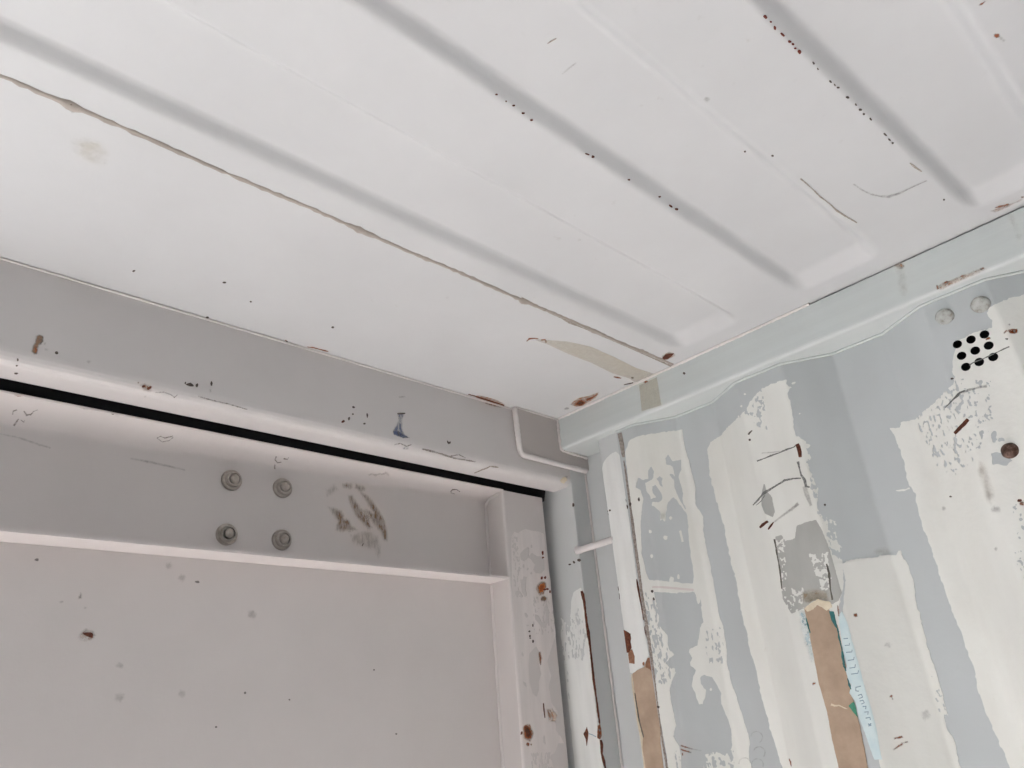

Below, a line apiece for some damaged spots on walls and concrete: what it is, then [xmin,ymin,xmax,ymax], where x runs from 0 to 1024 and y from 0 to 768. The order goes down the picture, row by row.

water stain [336,485,386,539]
rust [521,725,533,746]
rust [538,576,551,601]
peeling [511,529,603,768]
peeling [602,429,751,768]
peeling [707,380,961,768]
peeling [890,294,1024,768]